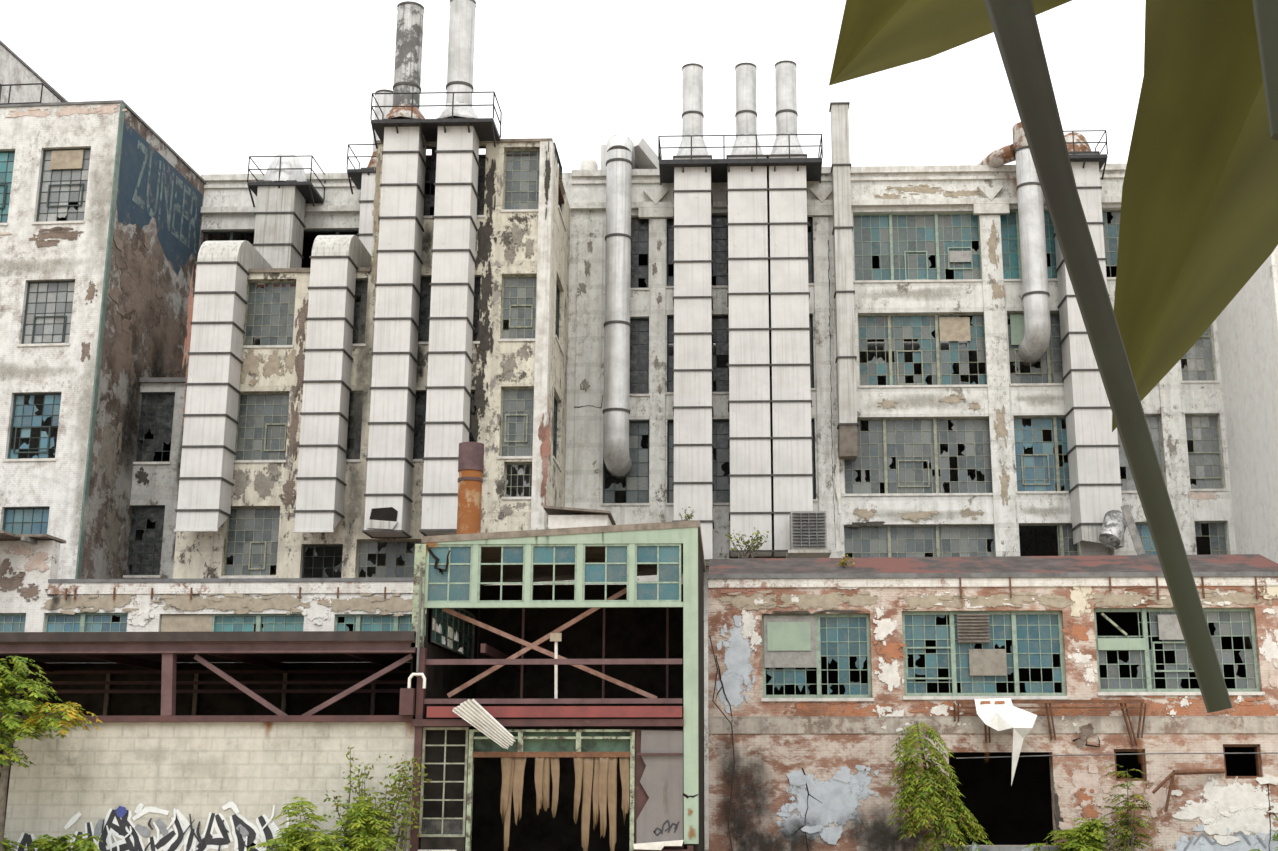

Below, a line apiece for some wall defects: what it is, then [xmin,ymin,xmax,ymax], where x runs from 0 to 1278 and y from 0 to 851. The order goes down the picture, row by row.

peeling [29,227,85,248]
damp [355,319,371,411]
damp [122,382,165,463]
damp [347,468,361,528]
flaking render [0,545,413,626]
flaking render [716,581,1278,747]
damp [723,755,814,851]
peeling [776,765,879,845]
damp [851,813,923,851]
peeling [1054,763,1117,840]
peeling [1145,773,1278,851]